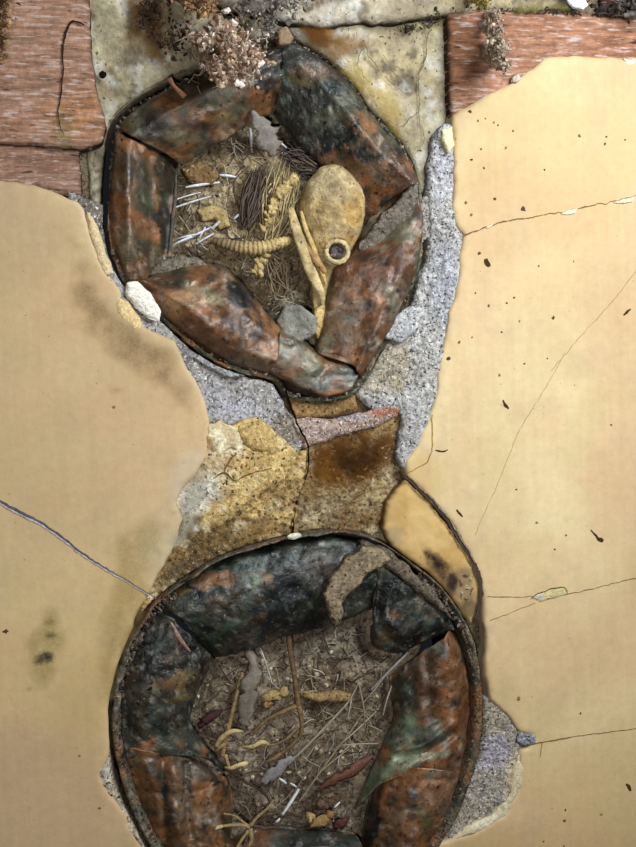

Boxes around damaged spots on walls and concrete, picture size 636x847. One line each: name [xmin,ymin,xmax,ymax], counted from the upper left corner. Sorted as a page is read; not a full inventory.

crack [461,195,636,236]
crack [404,271,636,621]
crack [0,500,156,599]